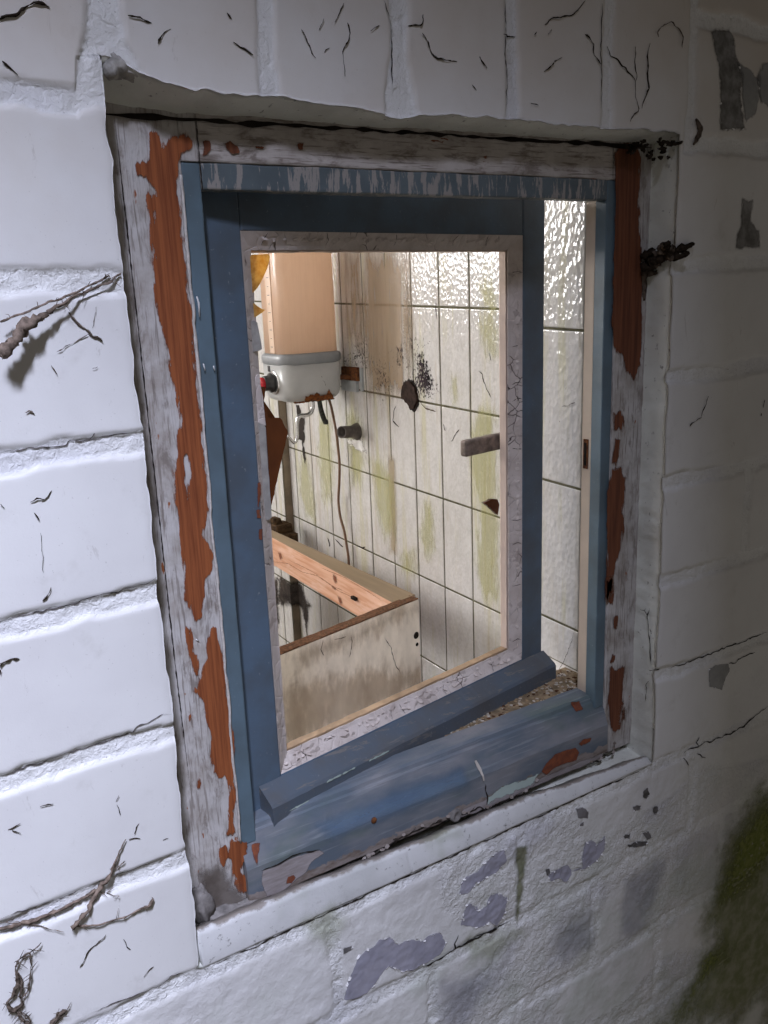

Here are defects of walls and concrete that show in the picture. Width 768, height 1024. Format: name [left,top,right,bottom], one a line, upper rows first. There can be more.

crack [384,1,393,84]
crack [502,4,510,105]
crack [597,5,605,105]
peeling [712,30,768,131]
peeling [611,143,642,380]
peeling [736,199,760,249]
peeling [135,131,323,897]
peeling [604,410,627,629]
peeling [348,654,625,865]
crack [684,708,766,765]
peeling [459,849,508,928]
peeling [344,933,447,1000]